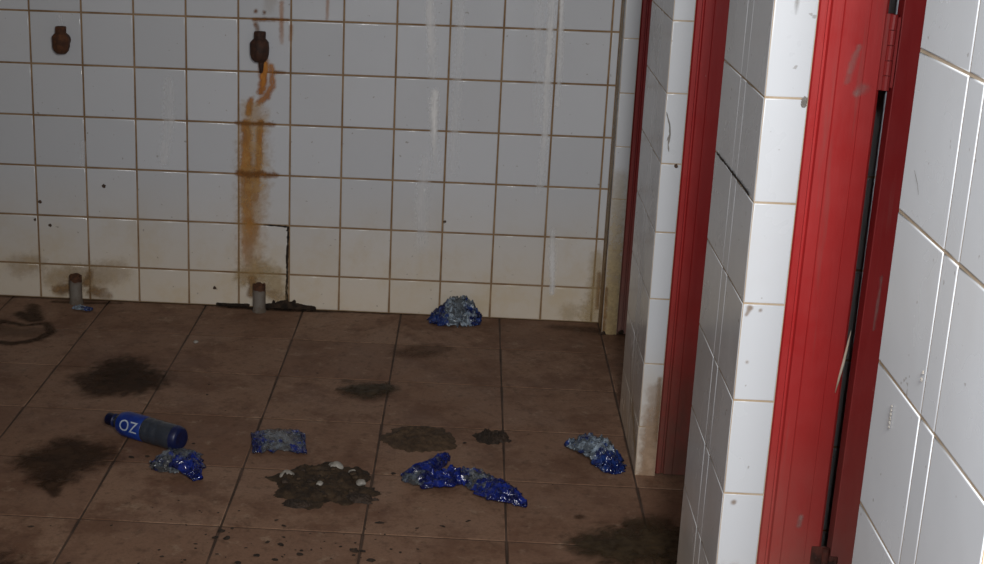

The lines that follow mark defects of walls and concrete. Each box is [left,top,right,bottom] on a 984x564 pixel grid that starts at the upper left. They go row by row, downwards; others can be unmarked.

corrosion [236,60,281,243]
damp [266,292,342,312]